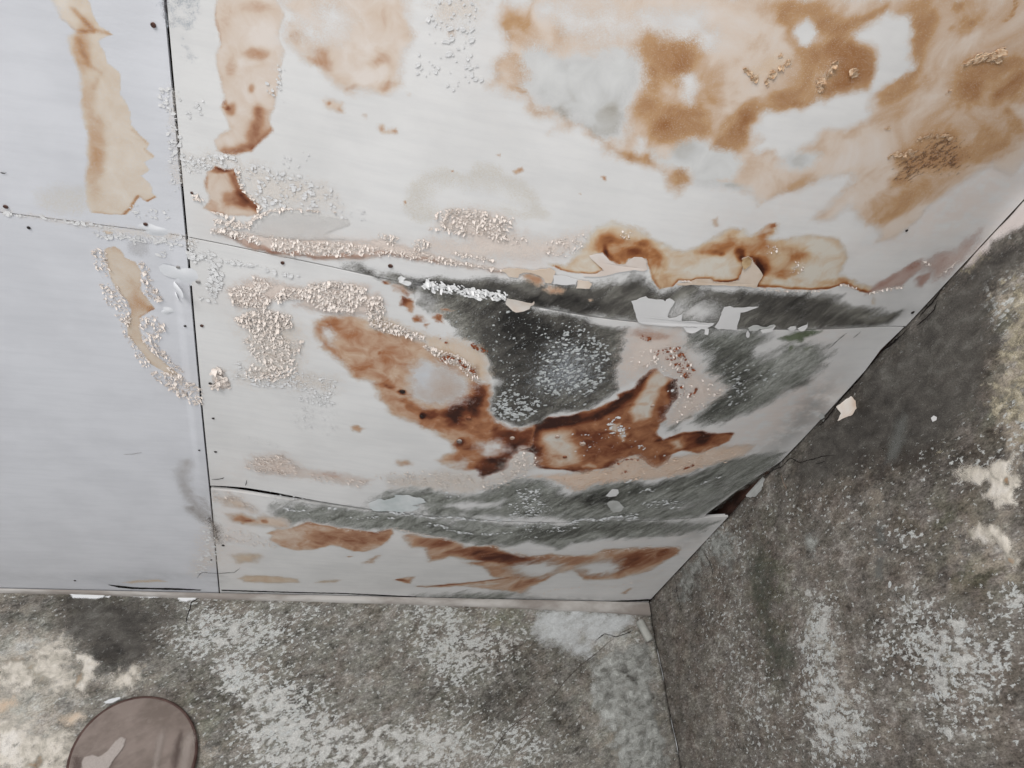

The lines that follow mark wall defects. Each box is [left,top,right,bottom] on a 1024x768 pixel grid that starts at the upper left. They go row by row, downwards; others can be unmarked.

corrosion [191,0,418,220]
corrosion [484,0,1024,304]
peeling [961,47,1008,68]
peeling [0,197,648,435]
corrosion [309,312,735,479]
damp [268,227,1024,551]
peeling [605,296,808,429]
corrosion [212,490,683,594]
damp [41,594,192,688]